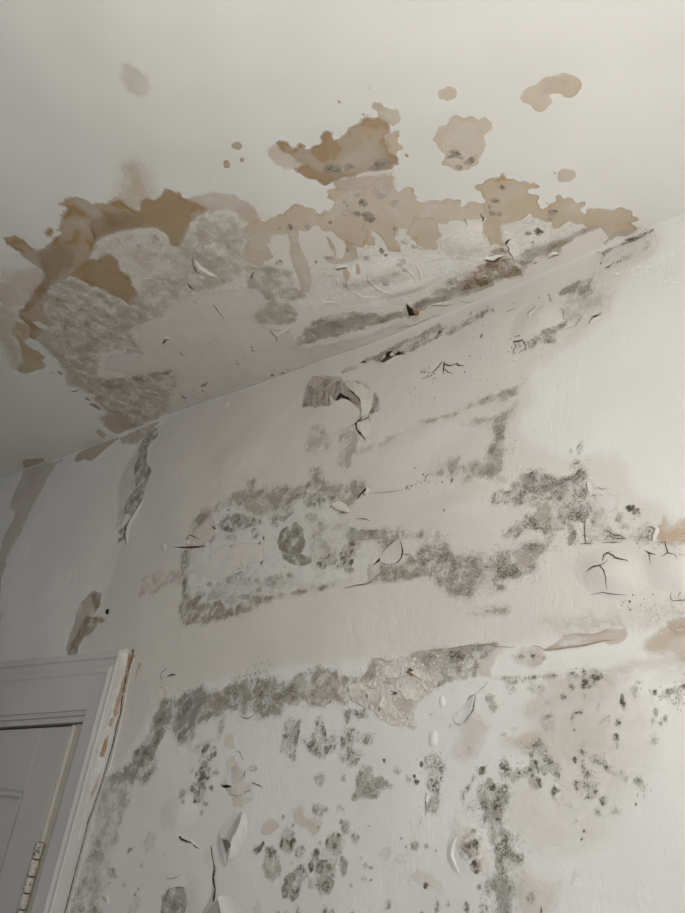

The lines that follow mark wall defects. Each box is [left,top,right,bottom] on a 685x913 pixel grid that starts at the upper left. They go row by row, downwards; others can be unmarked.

water stain [438,87,456,101]
water stain [520,73,581,112]
peeling [102,288,420,414]
water stain [0,103,653,542]
flaking render [302,360,379,441]
crack [415,362,465,399]
water stain [140,382,654,628]
crack [580,521,684,611]
flaking render [348,650,446,730]
water stain [69,659,392,913]
water stain [394,596,685,913]
peeling [181,811,247,913]